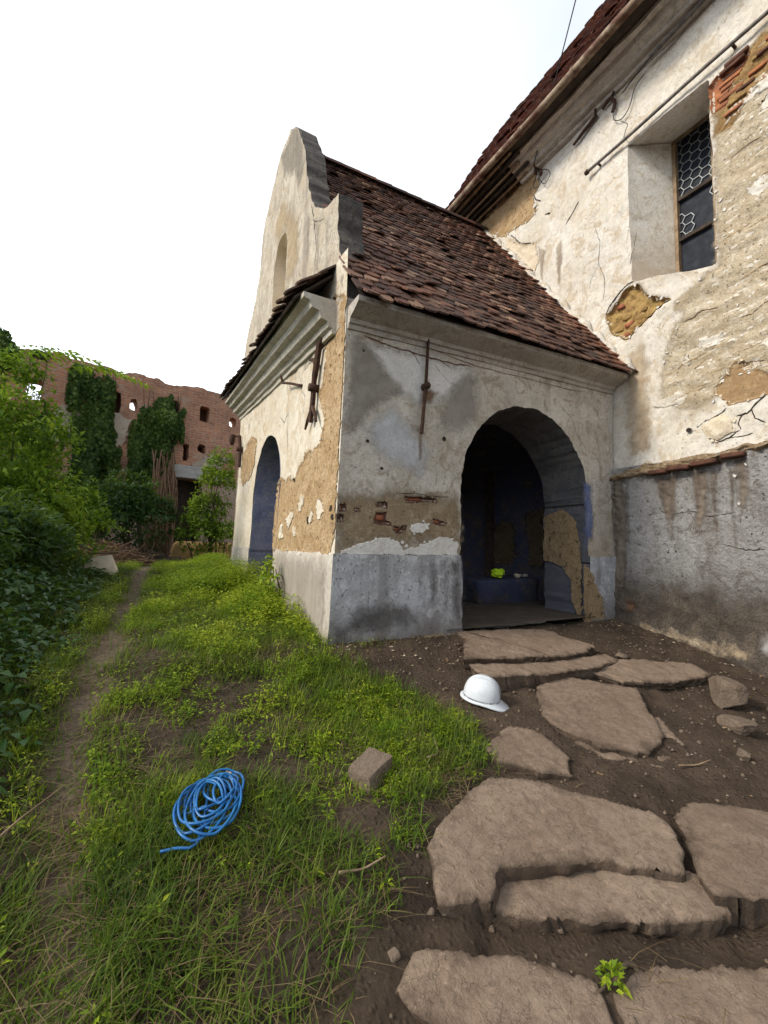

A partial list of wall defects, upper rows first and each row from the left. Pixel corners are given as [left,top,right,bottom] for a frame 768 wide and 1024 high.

flaking render [605,24,768,409]
flaking render [240,435,257,486]
flaking render [272,293,460,557]
crack [697,396,765,442]
flaking render [525,508,606,622]